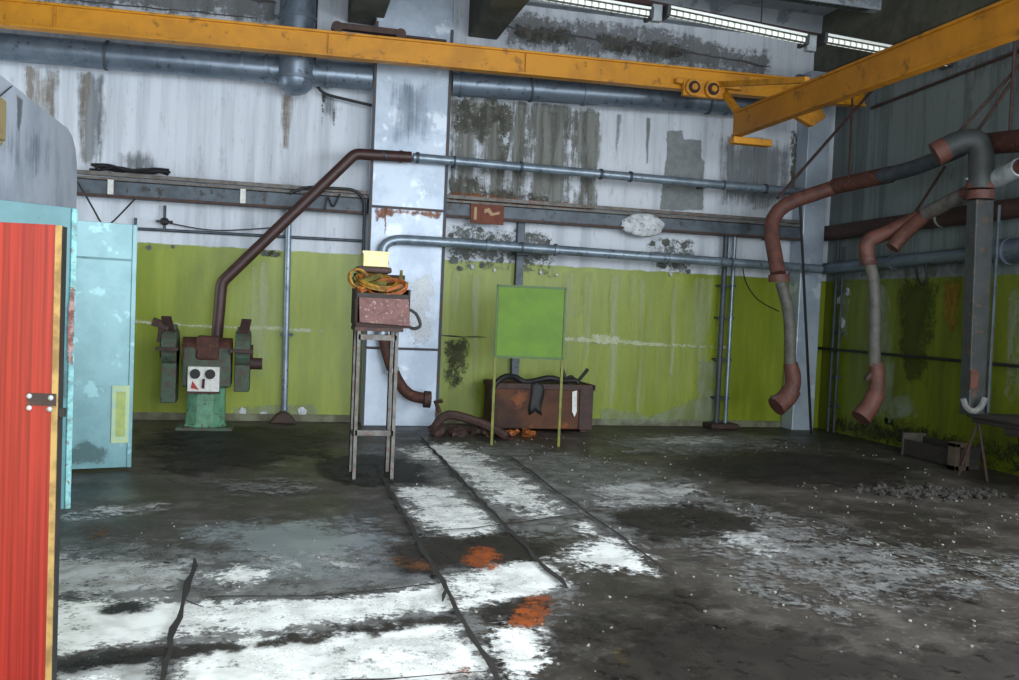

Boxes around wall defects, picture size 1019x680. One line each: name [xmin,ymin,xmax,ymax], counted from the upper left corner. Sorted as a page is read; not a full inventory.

water stain [507,12,769,74]
water stain [17,67,54,129]
water stain [79,73,103,162]
water stain [449,97,601,205]
water stain [660,131,704,211]
rust [375,208,441,230]
water stain [444,338,469,388]